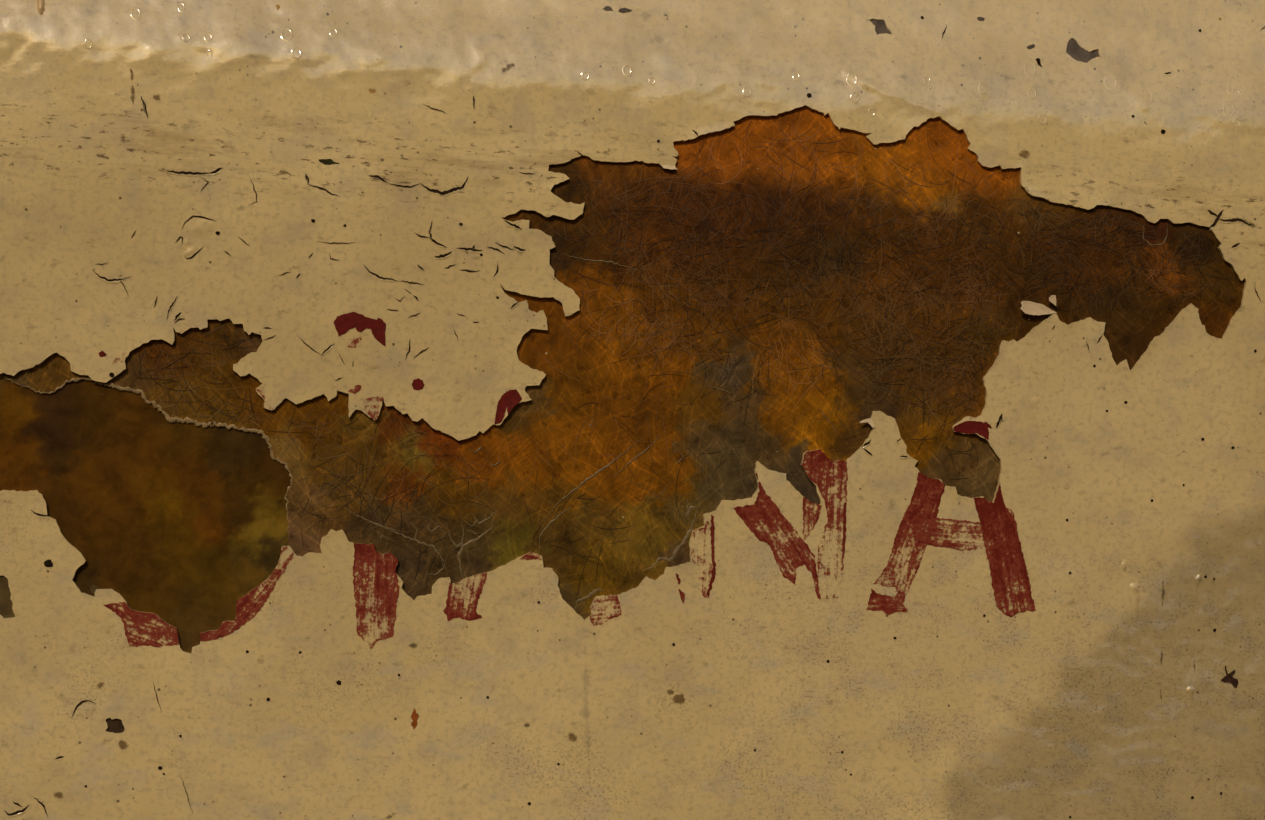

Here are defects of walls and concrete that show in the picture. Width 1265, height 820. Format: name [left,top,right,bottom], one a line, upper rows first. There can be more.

spalling [870,20,891,35]
spalling [1066,39,1099,63]
peeling [0,106,1245,653]